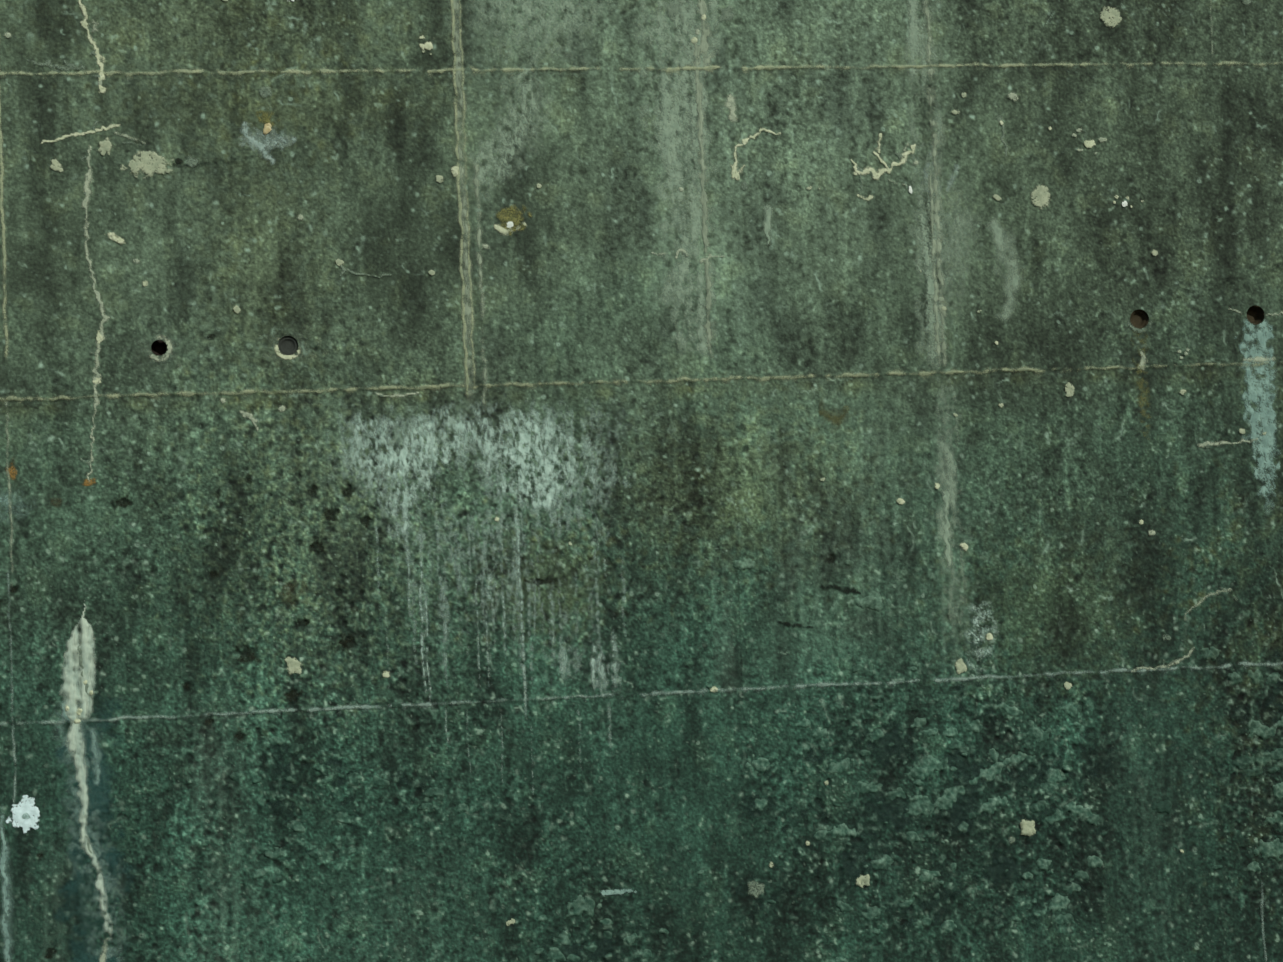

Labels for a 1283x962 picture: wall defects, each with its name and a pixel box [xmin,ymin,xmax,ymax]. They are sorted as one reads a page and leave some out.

crack [668,0,734,64]
crack [33,0,143,480]
crack [851,133,919,200]
leakage [1239,320,1280,497]
leakage [344,409,611,706]
leakage [591,641,617,683]
leakage [57,600,130,962]